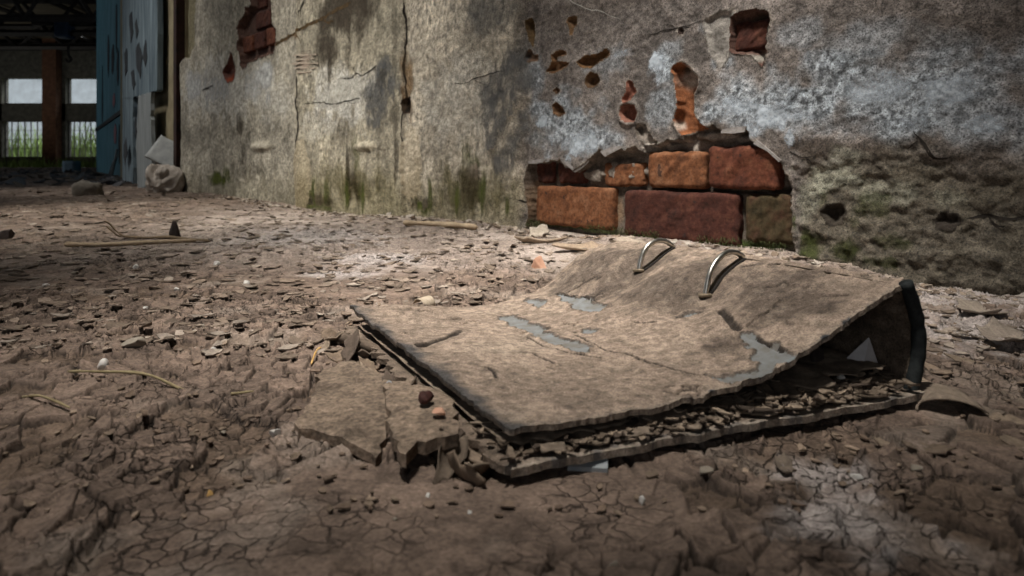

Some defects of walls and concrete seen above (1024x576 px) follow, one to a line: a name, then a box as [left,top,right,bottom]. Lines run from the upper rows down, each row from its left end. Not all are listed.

flaking render [222,0,276,83]
crack [275,0,350,46]
crack [295,0,411,148]
leakage [318,0,400,127]
flaking render [525,15,610,88]
flaking render [703,8,770,70]
leakage [342,149,364,214]
flaking render [514,62,796,269]